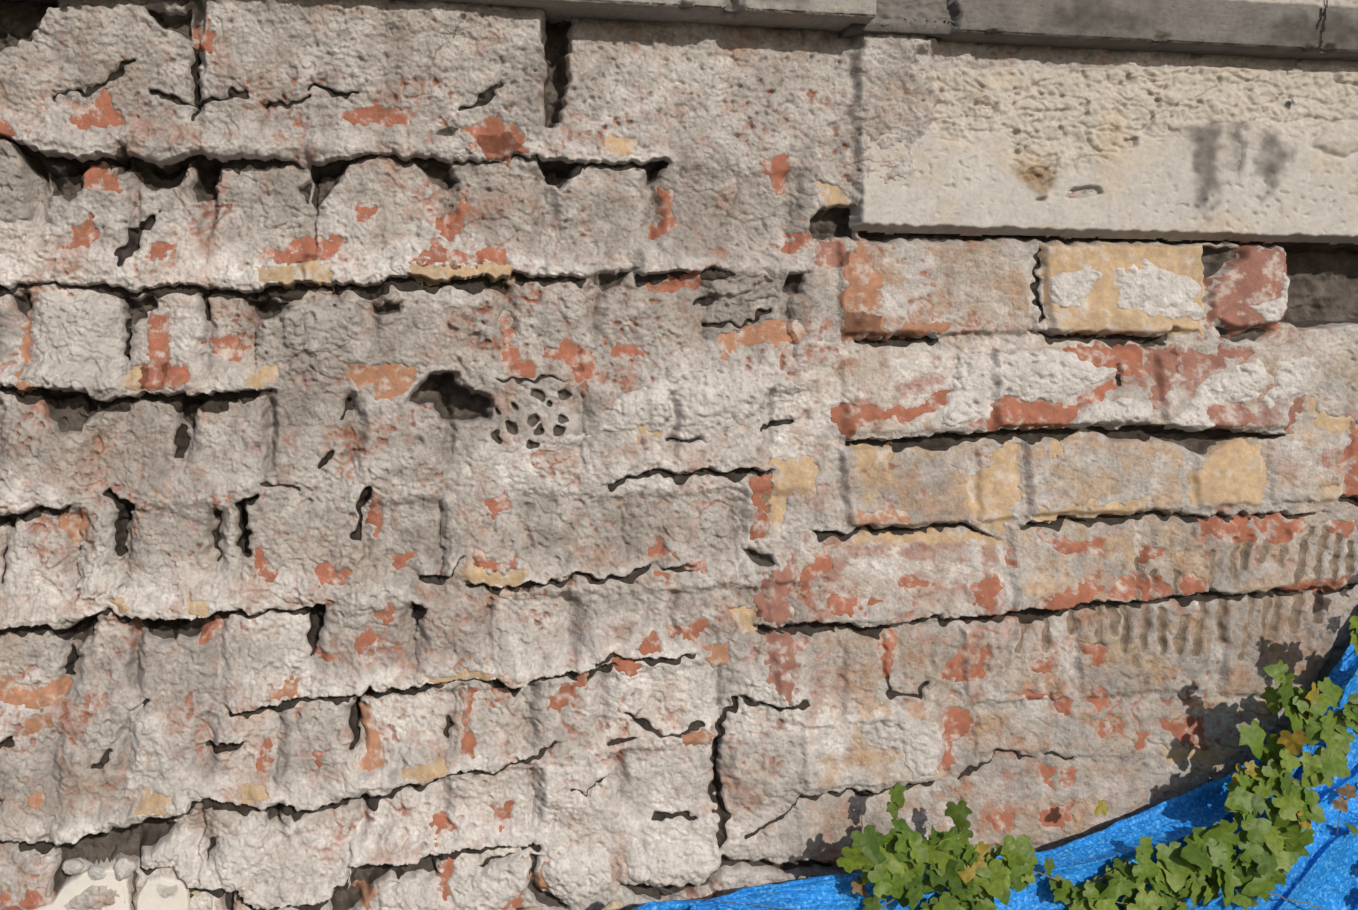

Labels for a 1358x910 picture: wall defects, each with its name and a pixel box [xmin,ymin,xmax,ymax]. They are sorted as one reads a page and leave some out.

damp [1195,124,1243,203]
damp [1264,136,1286,186]
crack [114,210,161,267]
spalling [776,231,951,345]
spalling [826,389,952,472]
spalling [854,243,1358,613]
crack [212,397,354,562]
crack [103,488,135,557]
crack [307,604,326,656]
spalling [611,544,836,706]
crack [570,696,800,849]
spalling [1037,763,1077,829]